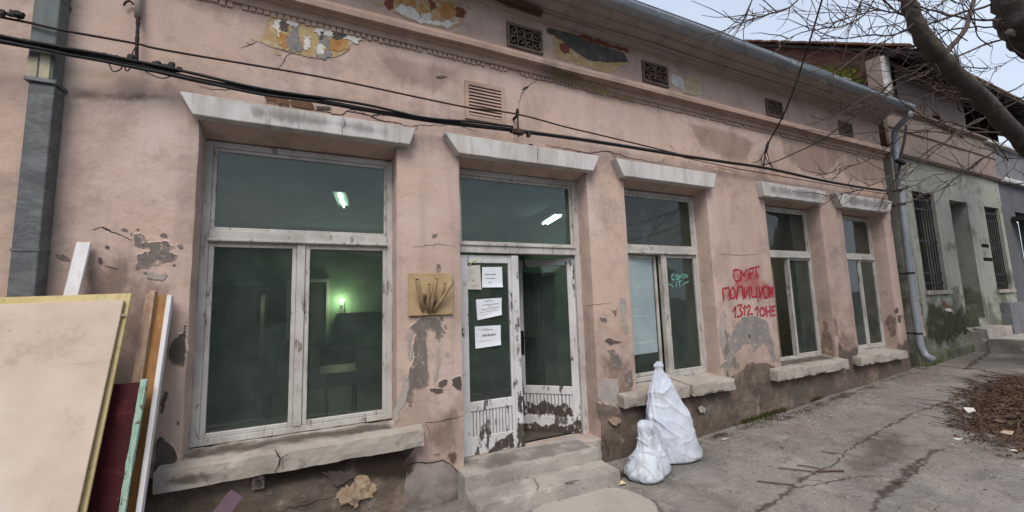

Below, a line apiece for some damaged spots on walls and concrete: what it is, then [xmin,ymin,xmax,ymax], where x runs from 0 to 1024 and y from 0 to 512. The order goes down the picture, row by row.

flaking render [246,12,364,60]
flaking render [377,0,471,34]
flaking render [510,22,630,74]
flaking render [121,228,183,280]
spalling [167,316,189,367]
flaking render [393,316,463,422]
flaking render [604,337,634,390]
flaking render [720,310,779,376]
spalling [151,436,180,472]